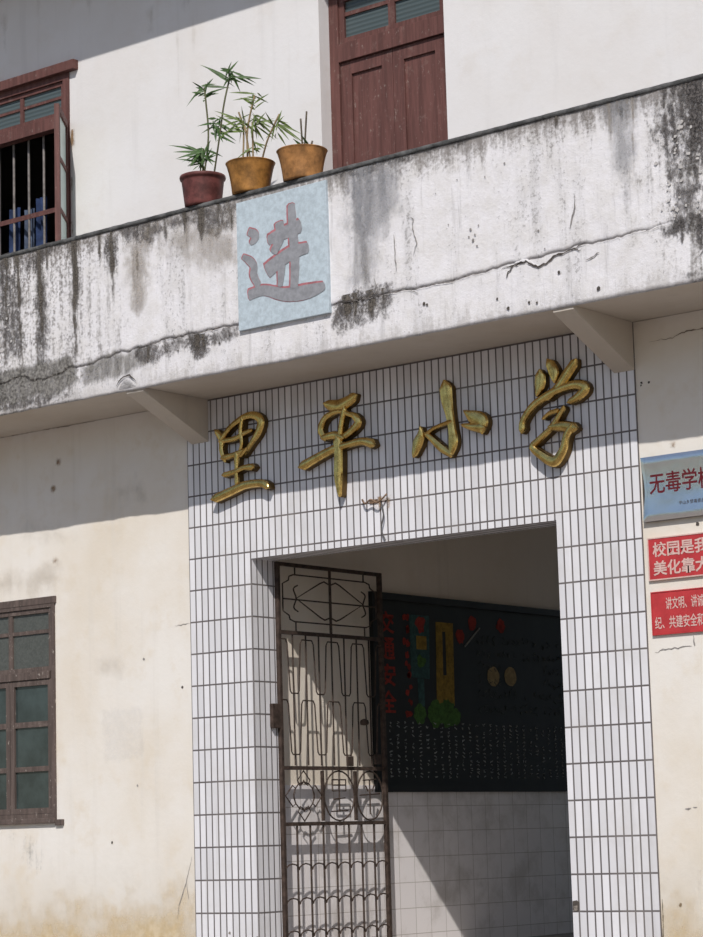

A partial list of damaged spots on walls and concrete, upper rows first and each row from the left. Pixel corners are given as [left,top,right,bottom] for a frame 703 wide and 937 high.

water stain [652,79,703,247]
water stain [0,240,239,410]
water stain [98,199,242,295]
water stain [333,283,392,333]
crack [340,194,678,323]